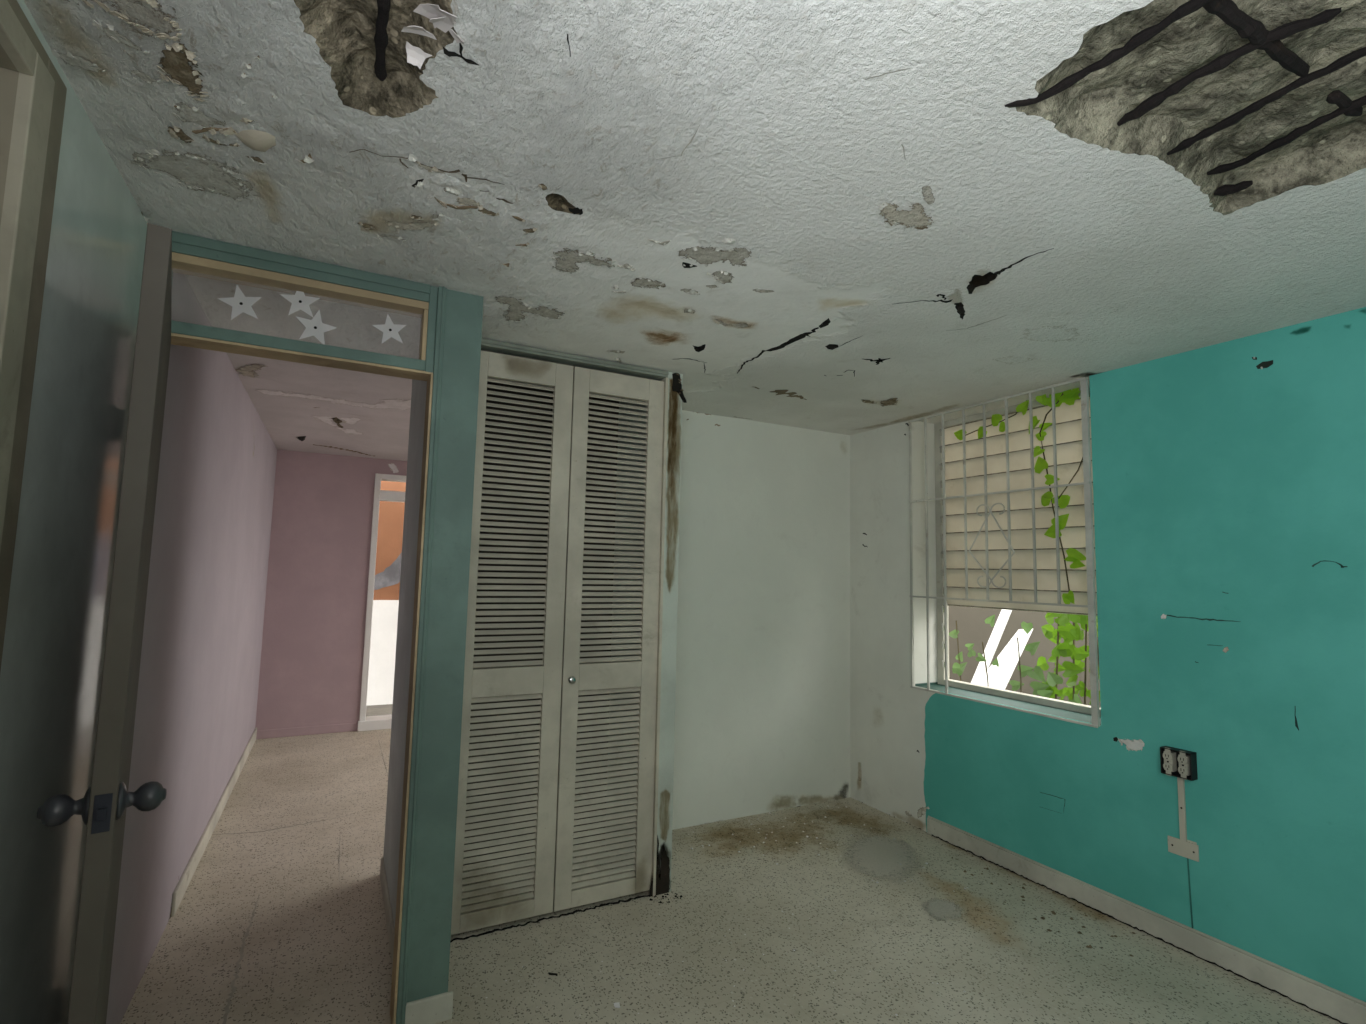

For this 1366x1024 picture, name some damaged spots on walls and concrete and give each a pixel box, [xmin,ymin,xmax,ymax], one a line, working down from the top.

spalling [294,0,465,118]
peeling [67,0,267,202]
spalling [1004,0,1366,215]
spalling [538,184,579,215]
peeling [878,186,935,228]
peeling [550,237,752,313]
crack [993,248,1054,275]
peeling [495,296,565,322]
crack [896,294,1006,331]
crack [680,318,890,426]
leakage [649,836,670,897]